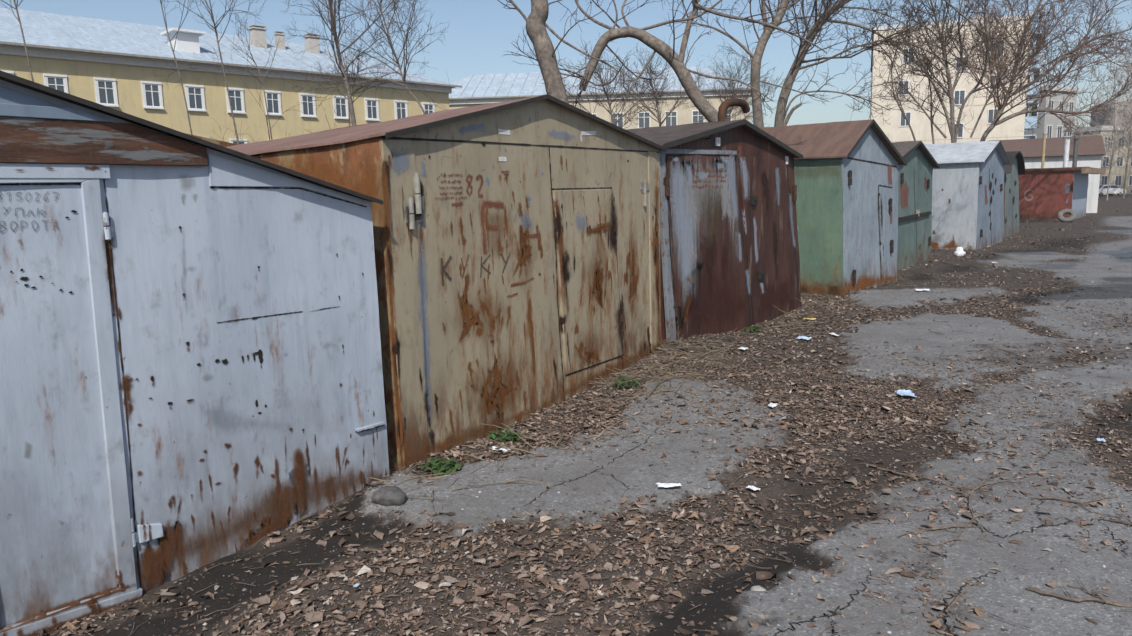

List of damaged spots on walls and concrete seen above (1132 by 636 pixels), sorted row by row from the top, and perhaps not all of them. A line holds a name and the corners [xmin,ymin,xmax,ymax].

rust [1,155,667,636]
rust [759,223,896,310]